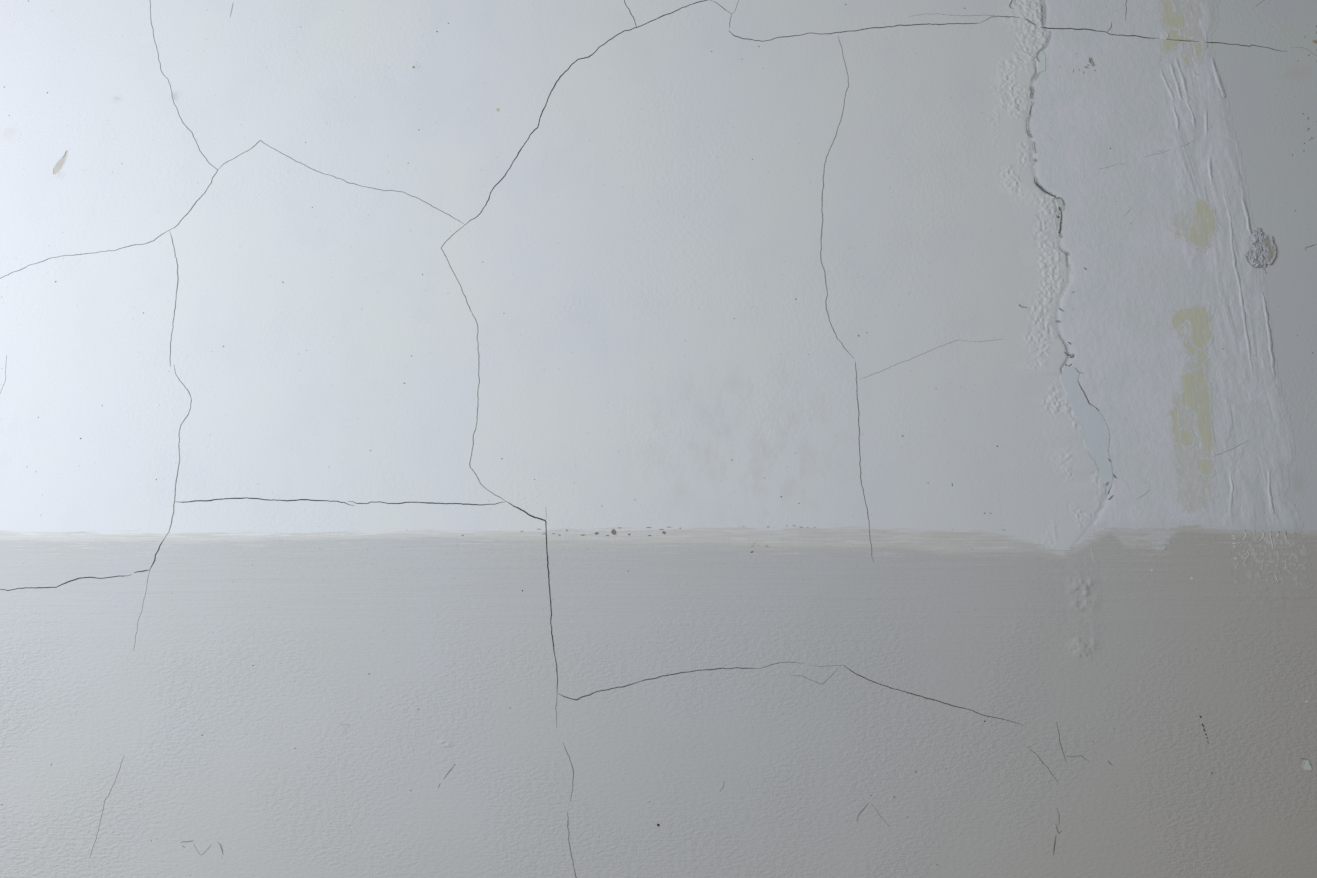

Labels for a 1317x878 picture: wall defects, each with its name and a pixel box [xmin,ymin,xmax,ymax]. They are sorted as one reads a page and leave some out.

crack [1166,39,1316,56]
crack [0,0,1148,727]
crack [1028,723,1088,781]
crack [89,757,124,858]
crack [564,746,576,877]